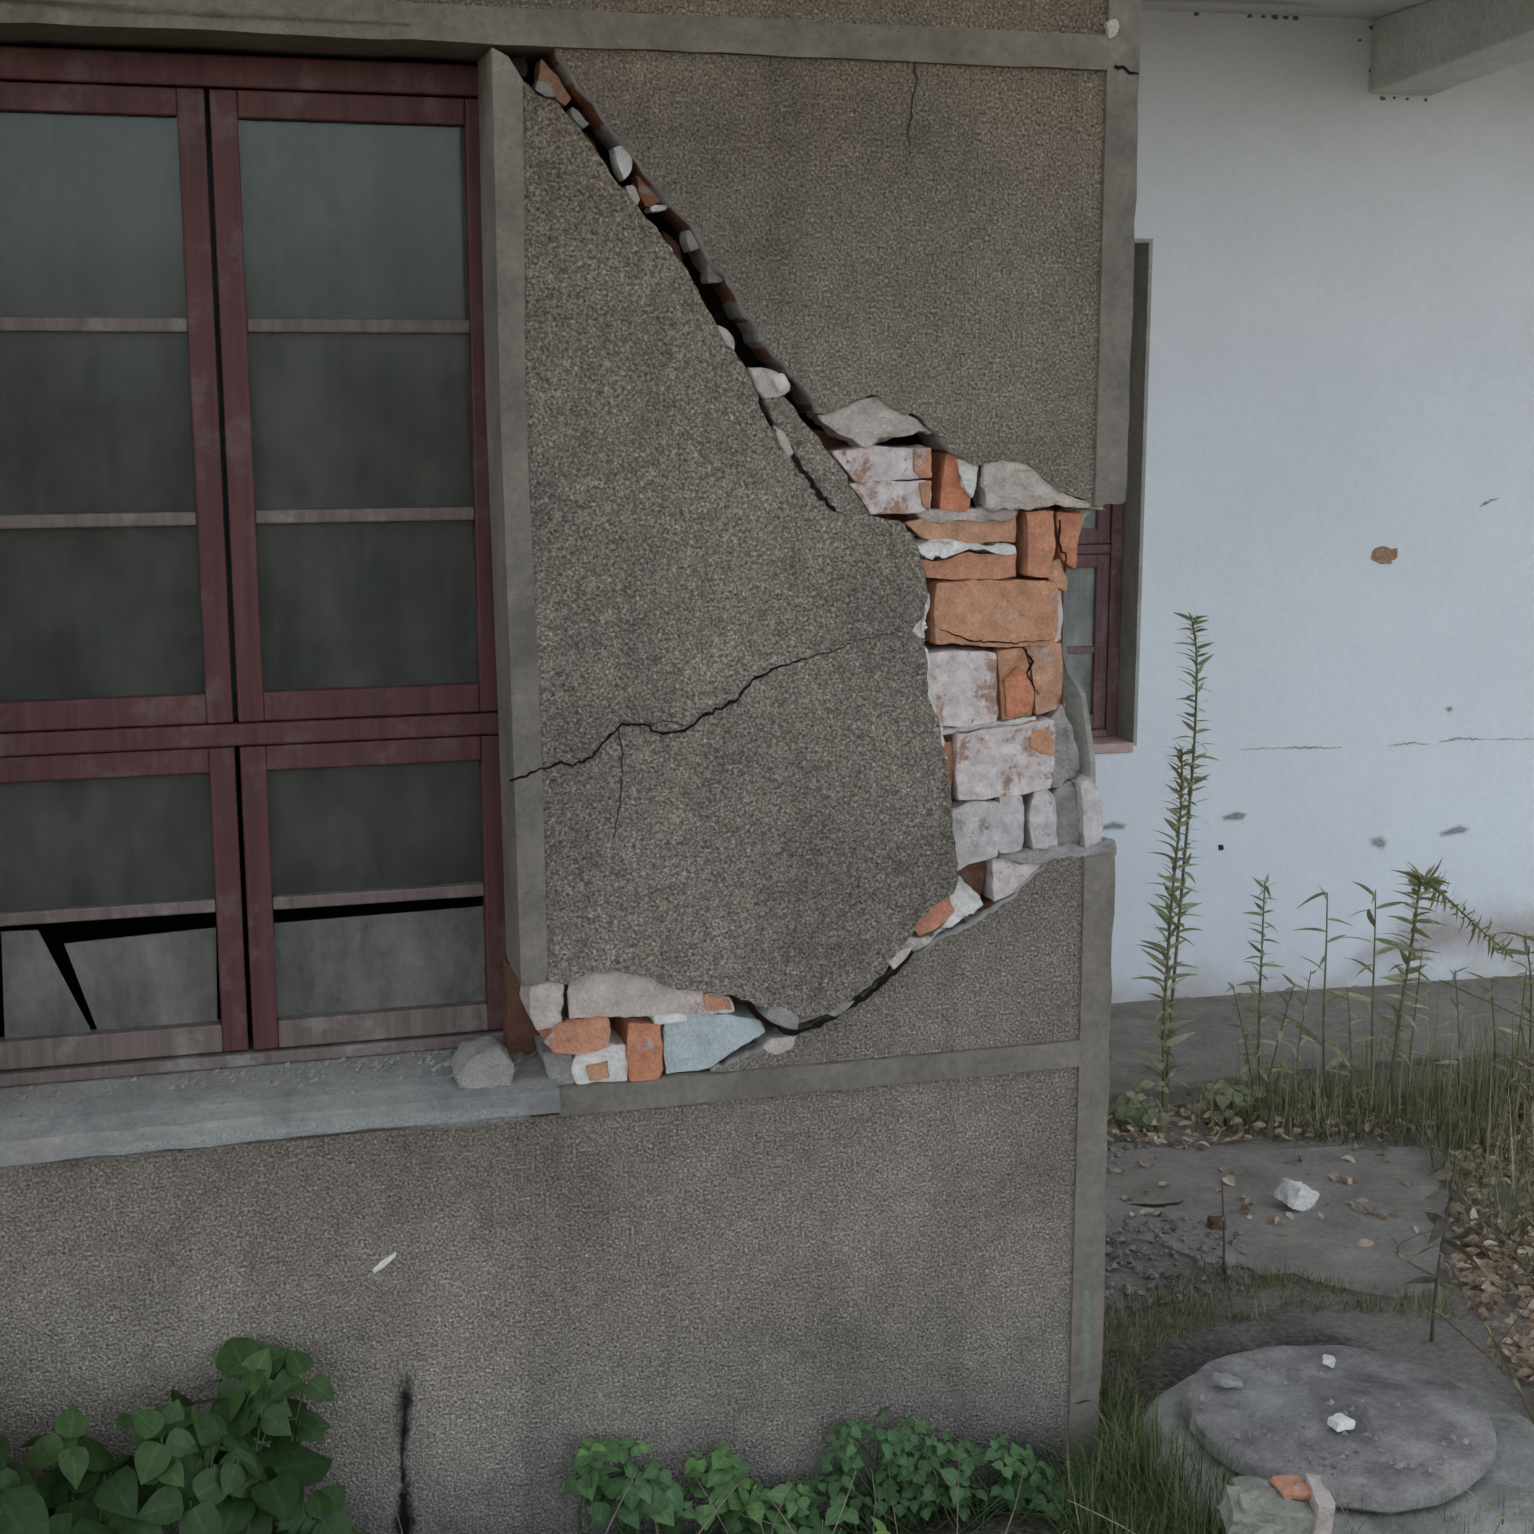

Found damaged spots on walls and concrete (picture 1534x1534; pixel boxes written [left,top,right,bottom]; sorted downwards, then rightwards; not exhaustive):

peeling [1371,546,1398,564]
crack [509,631,904,843]
spalling [807,396,1117,952]
spalling [503,957,799,1085]
damp [396,1389,415,1534]